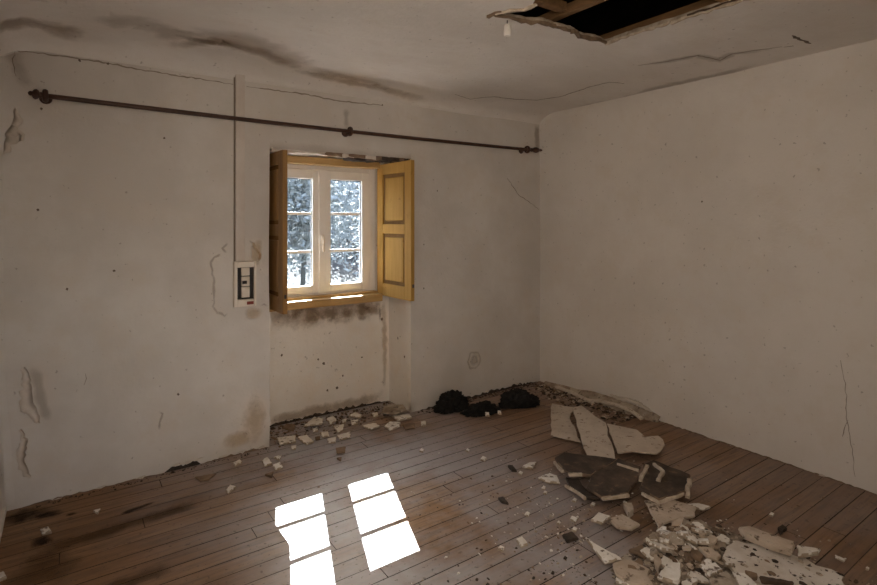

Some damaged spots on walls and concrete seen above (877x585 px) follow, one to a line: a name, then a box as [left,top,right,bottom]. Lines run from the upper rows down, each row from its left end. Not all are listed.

flaking render [487,0,751,46]
crack [638,35,811,66]
flaking render [270,401,386,445]
crack [840,360,855,475]